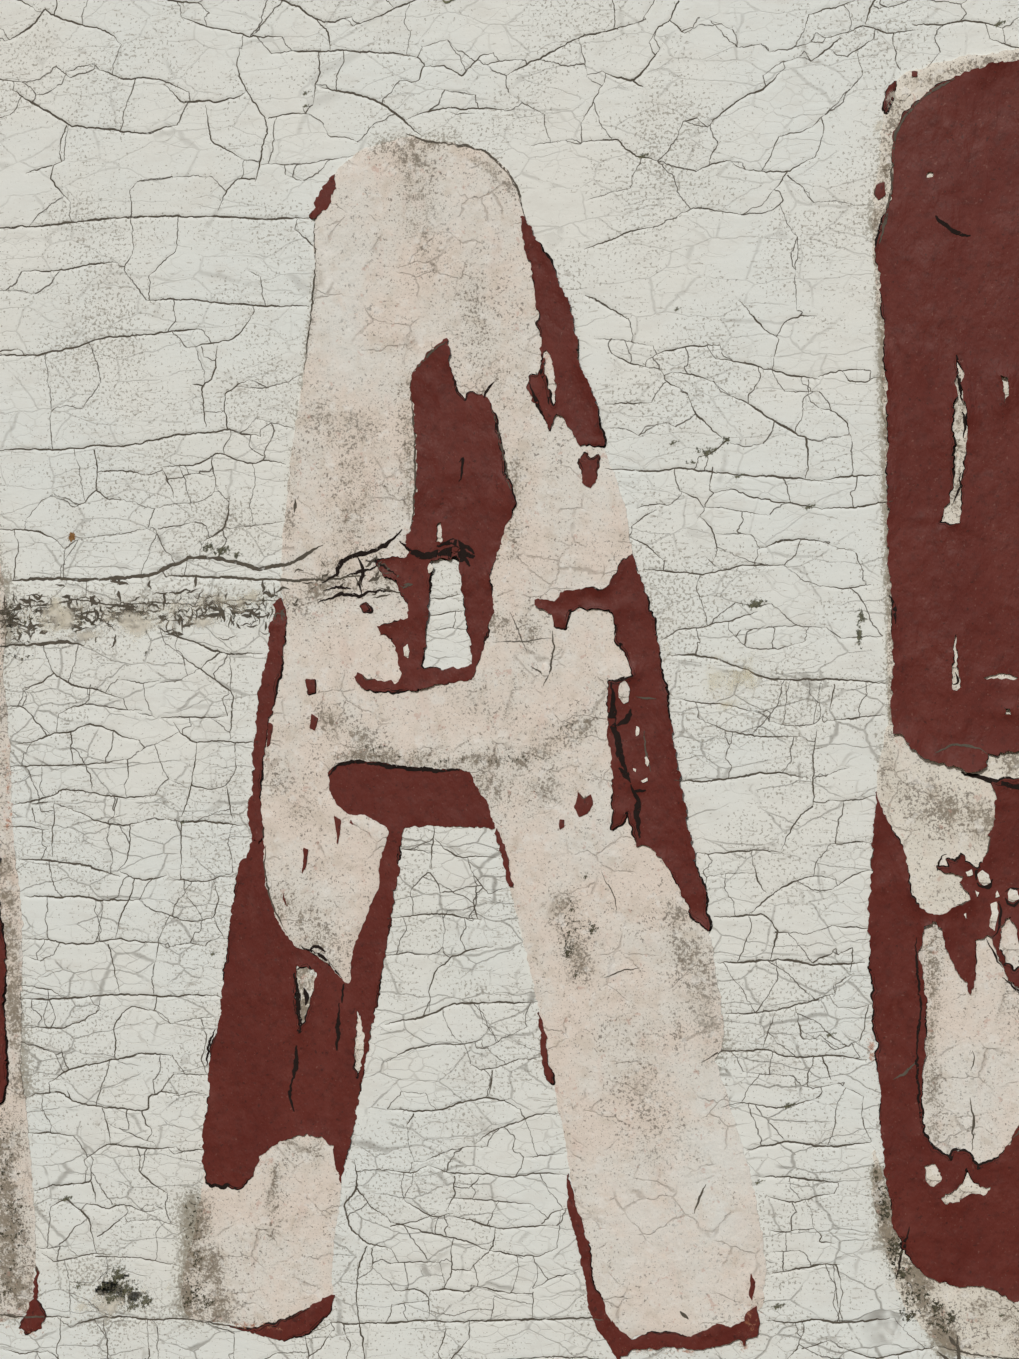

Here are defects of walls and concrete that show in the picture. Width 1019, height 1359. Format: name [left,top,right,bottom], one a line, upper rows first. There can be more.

crack [0,0,656,1359]
peeling [260,136,767,1339]
spalling [856,608,866,649]
peeling [871,49,1019,1204]
crack [935,743,1019,790]
peeling [0,564,36,1322]
peeling [181,1133,342,1326]
crack [694,1184,706,1214]
crack [893,937,924,1136]
peeling [871,1150,1019,1359]
crack [968,1051,976,1150]
crack [975,867,1019,994]